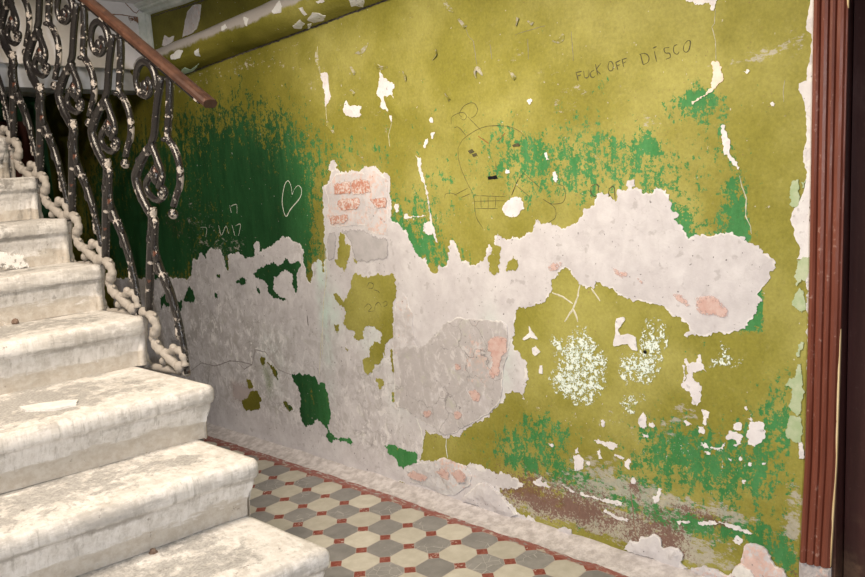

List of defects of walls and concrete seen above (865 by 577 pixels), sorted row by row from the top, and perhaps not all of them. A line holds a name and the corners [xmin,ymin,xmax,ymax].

flaking render [162,4,201,74]
peeling [293,0,326,29]
peeling [686,0,717,11]
peeling [315,46,331,107]
crack [739,176,752,234]
peeling [113,117,776,522]
crack [552,285,600,322]
flaking render [625,520,787,577]